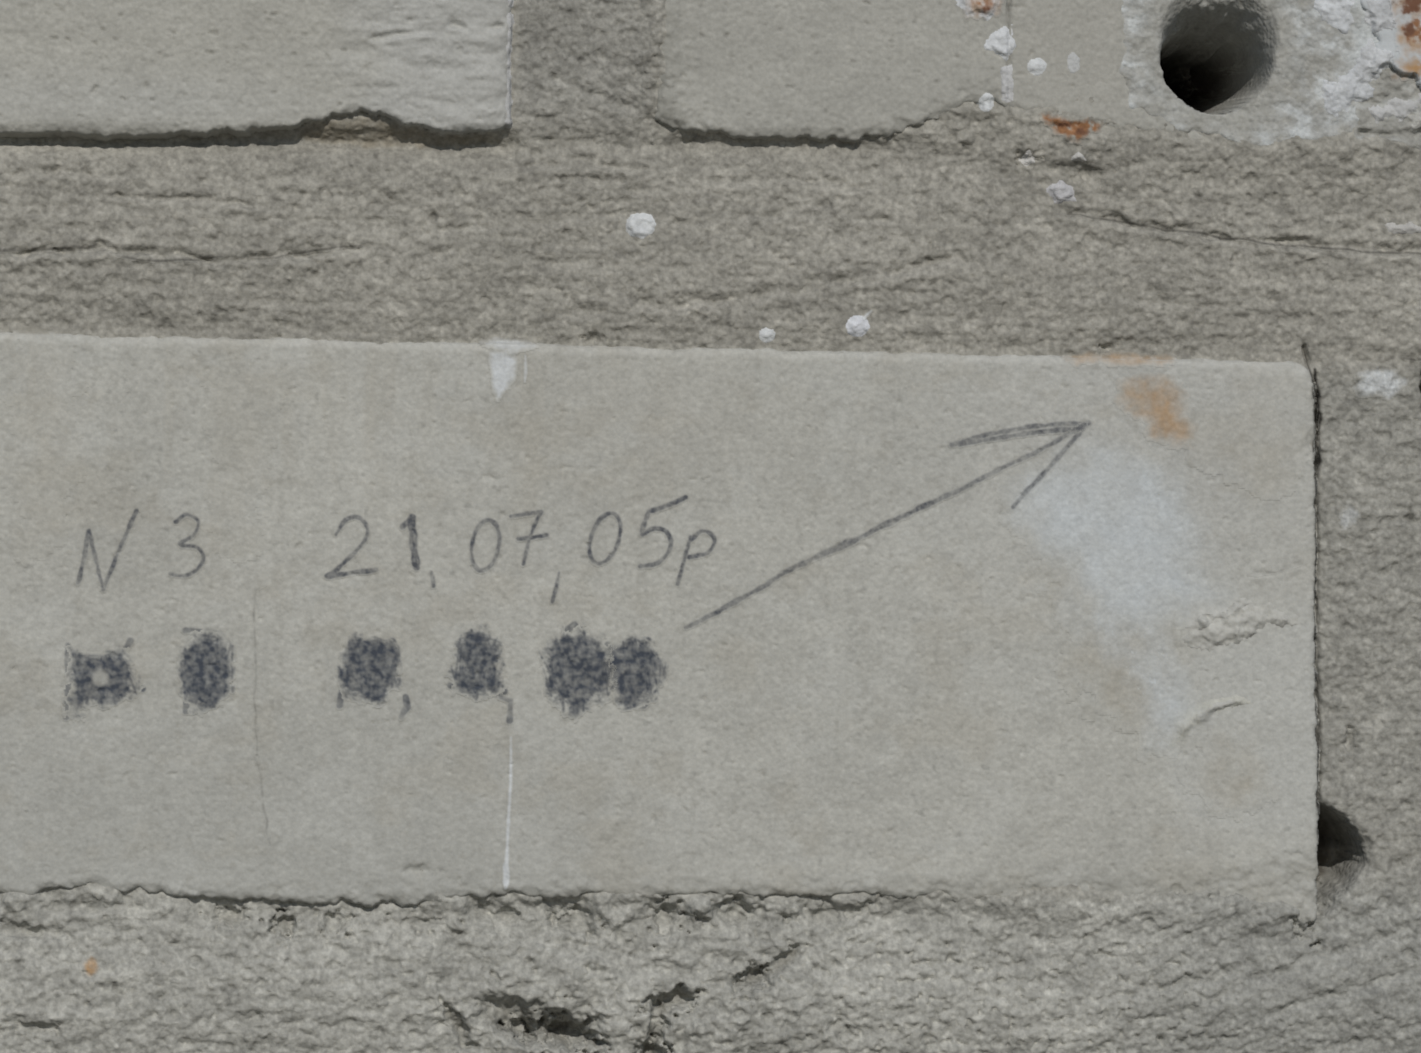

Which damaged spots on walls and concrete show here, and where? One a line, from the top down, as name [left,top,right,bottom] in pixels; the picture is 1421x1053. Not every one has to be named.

corrosion [962,0,1005,20]
spalling [1119,0,1421,150]
corrosion [1388,0,1421,81]
crack [1402,356,1421,393]